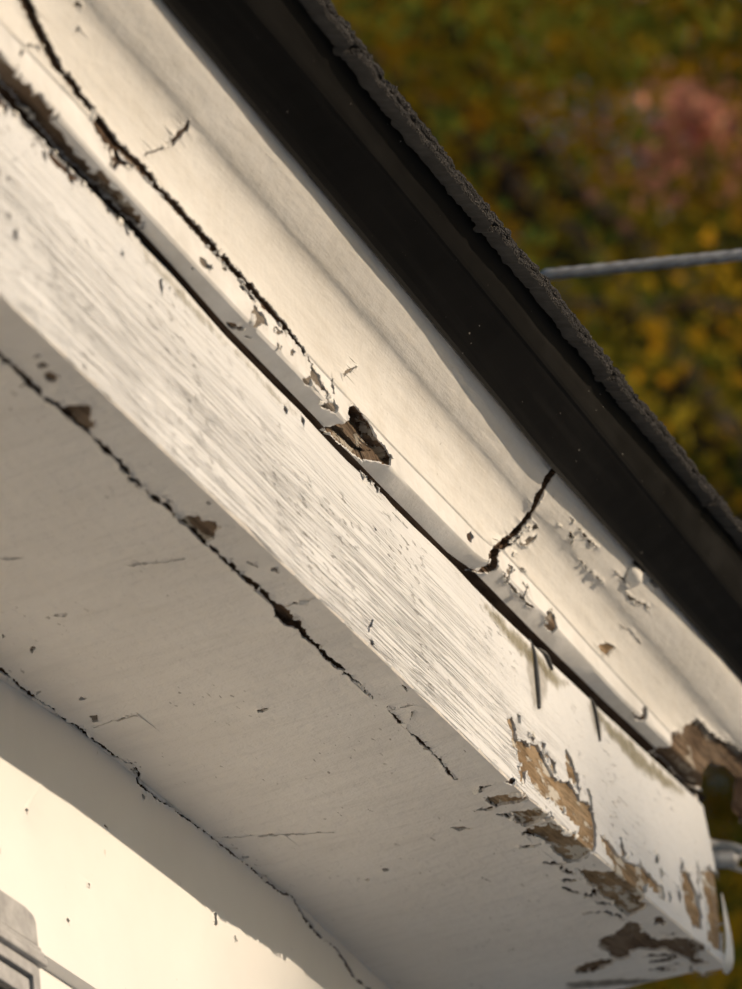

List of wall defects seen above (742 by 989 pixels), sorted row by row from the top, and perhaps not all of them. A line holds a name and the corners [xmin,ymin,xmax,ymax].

peeling [0,53,146,239]
crack [19,0,313,365]
crack [0,353,515,793]
crack [465,468,556,575]
crack [558,517,660,644]
crack [0,668,371,989]
peeling [473,714,734,975]
peeling [631,706,648,722]